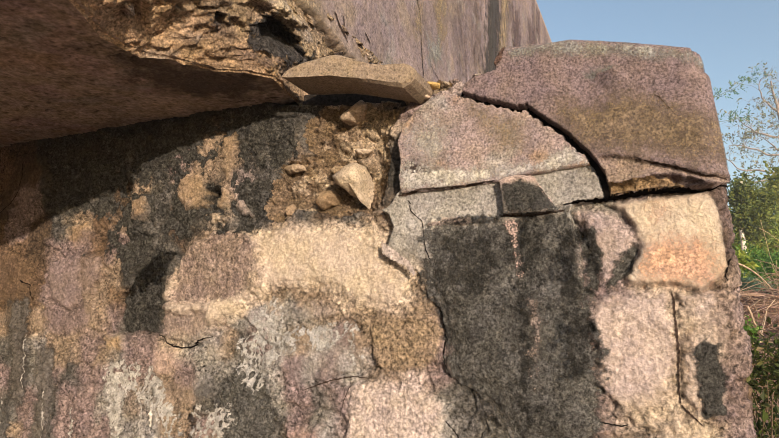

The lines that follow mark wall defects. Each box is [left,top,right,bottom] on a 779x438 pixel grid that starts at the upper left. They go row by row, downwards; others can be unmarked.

damp [38,53,319,277]
spalling [68,0,343,105]
spalling [264,101,410,223]
spalling [327,12,383,65]
spalling [427,80,452,94]
damp [428,0,514,80]
crack [461,92,731,217]
damp [558,92,726,165]
damp [123,283,161,334]
damp [400,147,638,438]
crack [671,292,703,426]
damp [692,338,730,420]